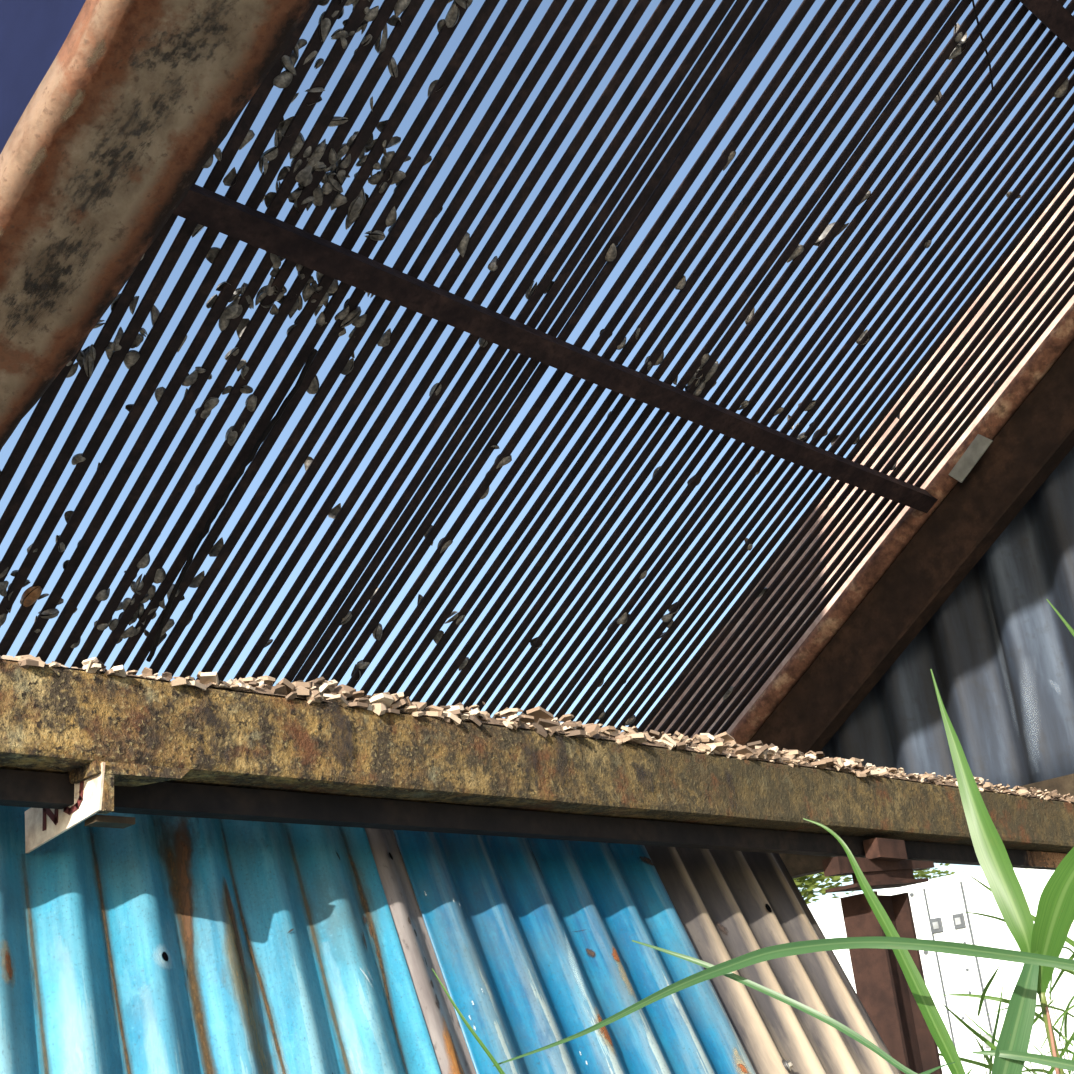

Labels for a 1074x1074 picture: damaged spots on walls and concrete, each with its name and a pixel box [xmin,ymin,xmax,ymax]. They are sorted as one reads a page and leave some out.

corrosion [3,0,239,337]
corrosion [3,942,14,980]
corrosion [160,822,214,1074]
corrosion [225,865,285,1074]
corrosion [431,980,465,1074]